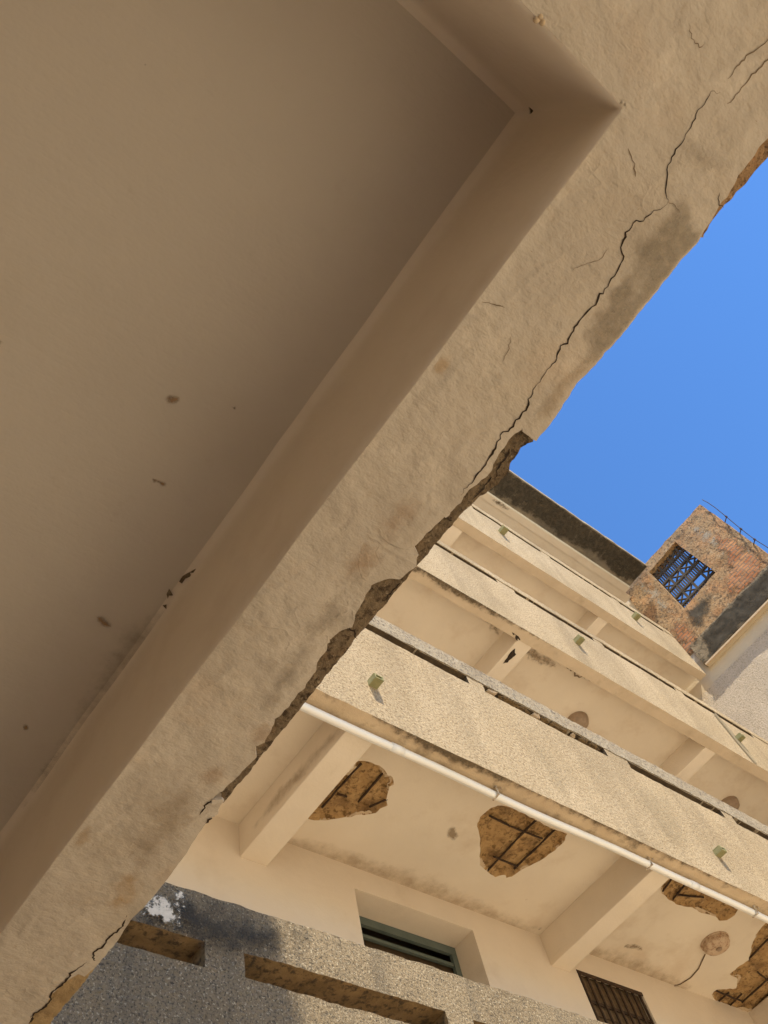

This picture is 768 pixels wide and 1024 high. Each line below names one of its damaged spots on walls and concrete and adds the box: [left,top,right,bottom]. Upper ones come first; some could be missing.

spalling [701,139,768,238]
crack [463,40,768,490]
damp [596,214,698,351]
damp [490,472,646,581]
flaking render [695,528,762,597]
spalling [204,430,533,820]
spalling [477,805,567,878]
spalling [661,879,738,921]
crack [29,916,127,1023]
spalling [712,923,768,1012]